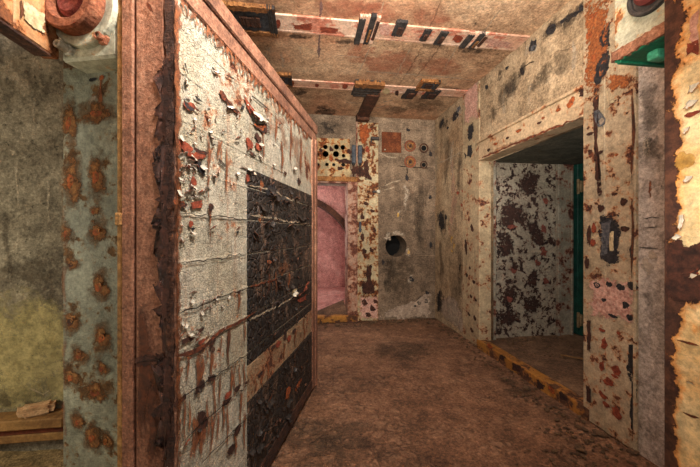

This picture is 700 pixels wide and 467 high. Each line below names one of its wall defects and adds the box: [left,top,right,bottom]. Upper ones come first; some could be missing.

peeling [686,9,699,56]
peeling [682,82,700,134]
rust [60,75,116,244]
peeling [174,93,279,211]
rust [359,123,375,161]
peeling [674,151,696,183]
rust [174,0,309,467]
peeling [672,214,685,241]
damp [0,301,63,410]